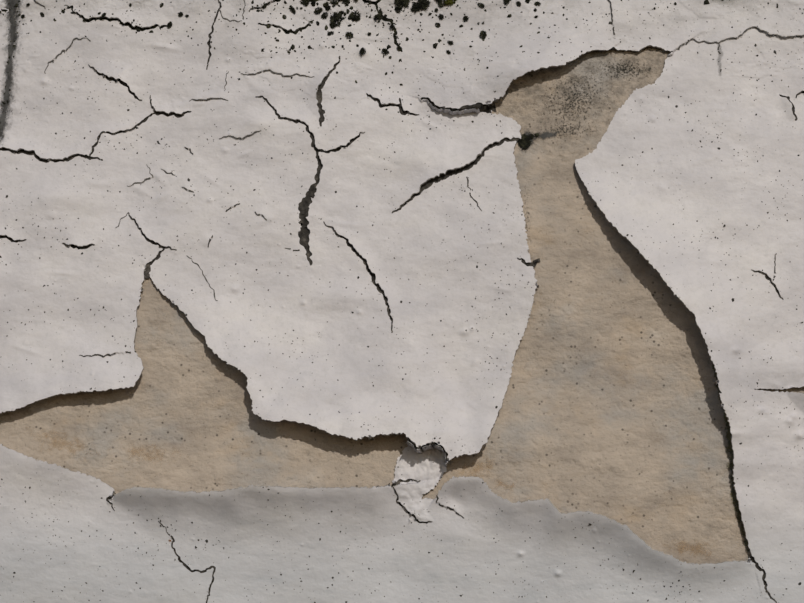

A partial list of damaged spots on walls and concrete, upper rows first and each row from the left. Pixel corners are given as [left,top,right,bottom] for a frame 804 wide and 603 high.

water stain [0,0,21,139]
crack [34,0,167,74]
crack [206,0,330,70]
crack [366,94,497,116]
crack [678,26,804,72]
crack [0,56,393,333]
crack [392,138,520,213]
peeling [0,141,538,536]
crack [517,257,540,267]
peeling [419,16,804,591]
crack [752,253,784,300]
crack [158,521,216,603]